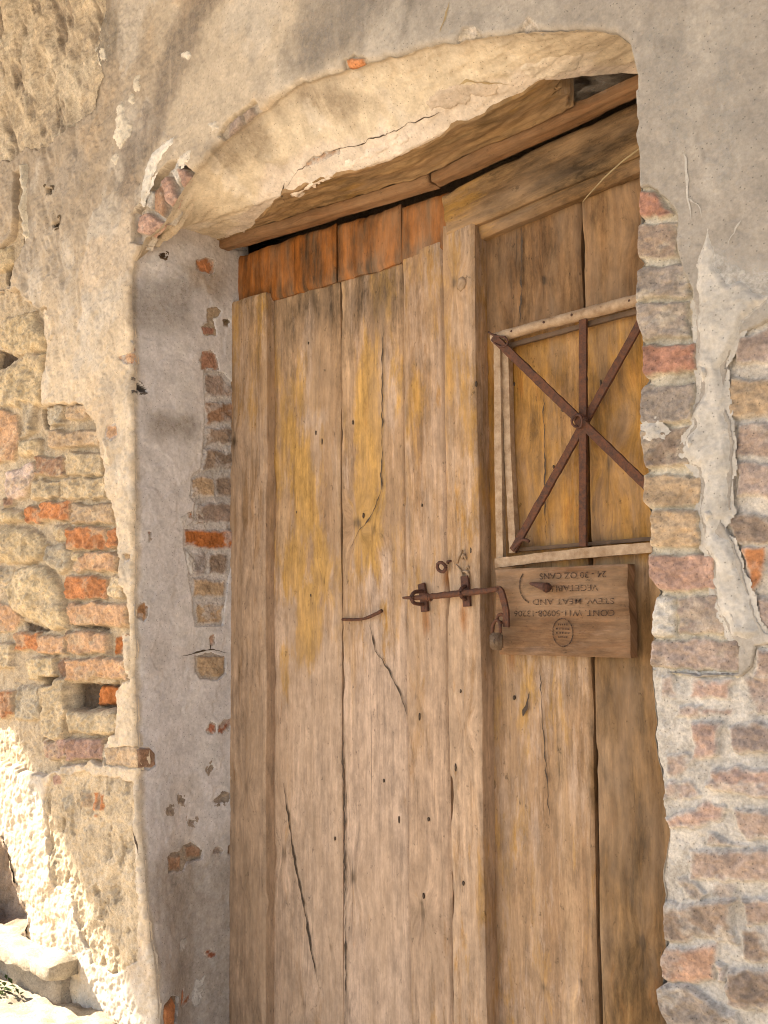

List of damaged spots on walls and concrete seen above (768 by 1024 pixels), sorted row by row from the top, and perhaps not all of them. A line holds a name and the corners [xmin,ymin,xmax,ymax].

spalling [137,137,195,251]
crack [281,114,436,200]
peeling [179,350,232,680]
spalling [0,286,155,974]
spalling [635,187,768,1024]
spalling [163,794,199,828]
spalling [167,842,230,872]
spalling [214,791,230,807]